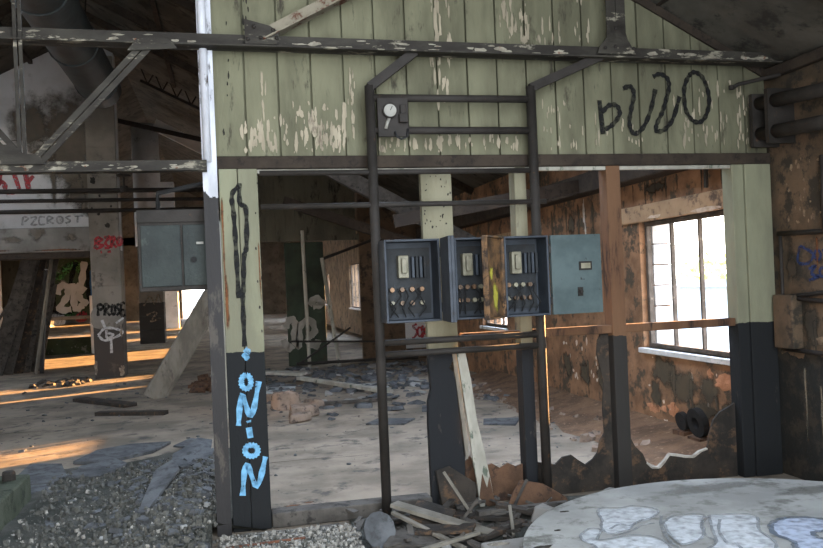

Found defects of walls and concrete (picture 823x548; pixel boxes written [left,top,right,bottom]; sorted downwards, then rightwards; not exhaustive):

peeling [429,0,452,110]
peeling [499,0,568,54]
peeling [240,68,355,153]
water stain [563,352,603,389]
water stain [651,355,732,420]